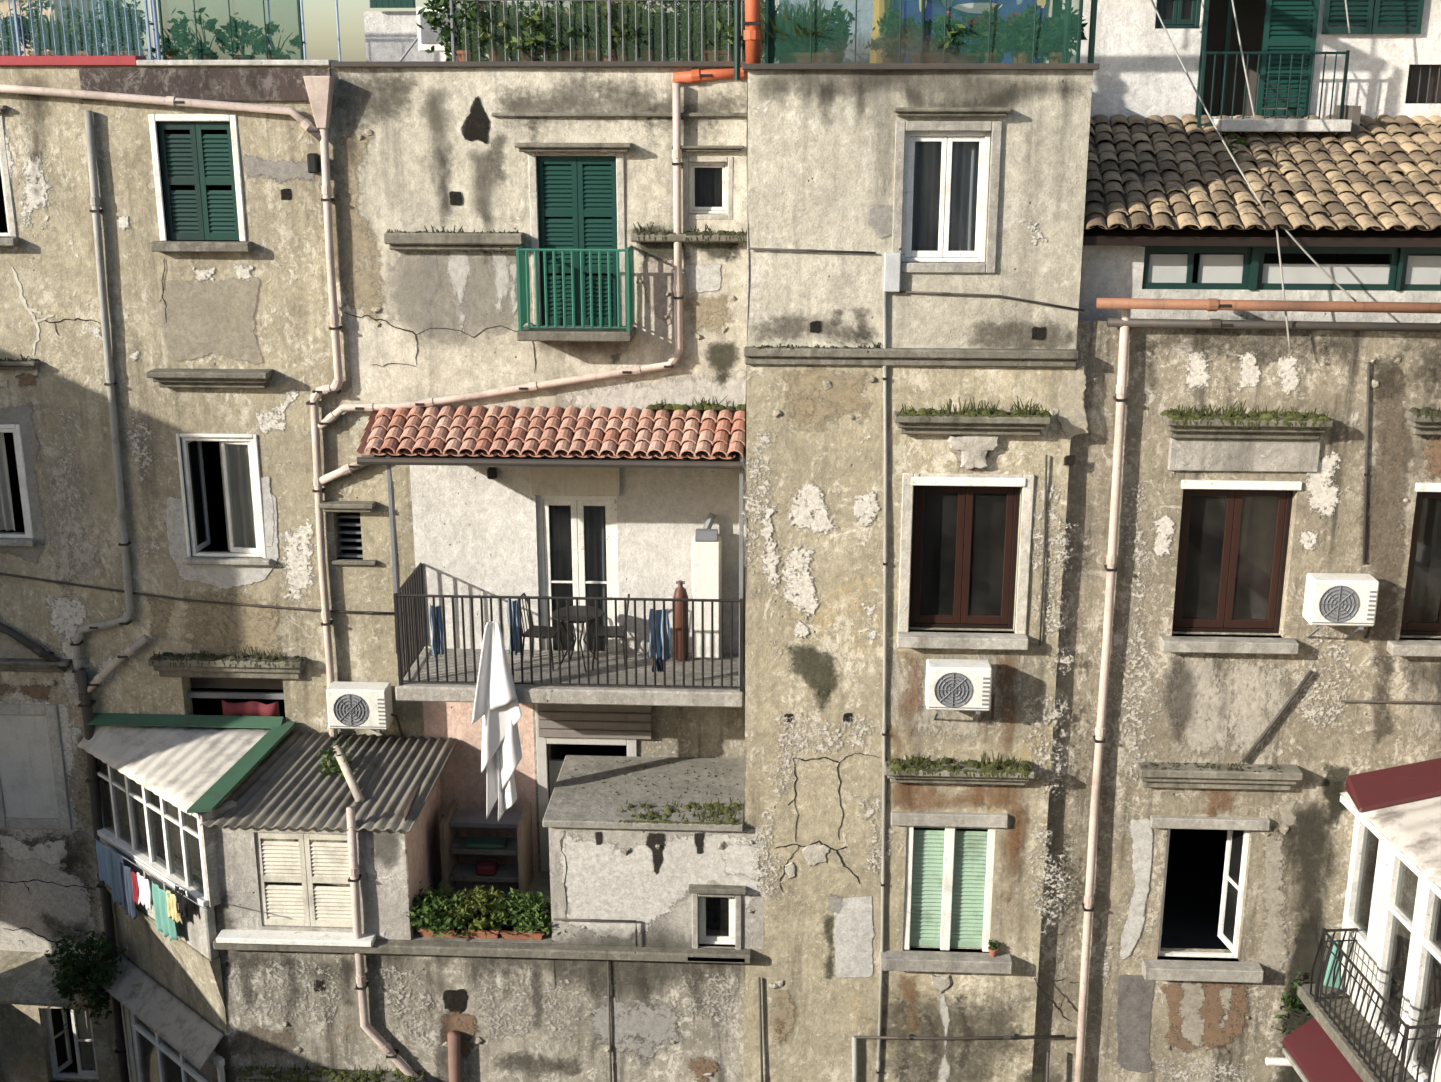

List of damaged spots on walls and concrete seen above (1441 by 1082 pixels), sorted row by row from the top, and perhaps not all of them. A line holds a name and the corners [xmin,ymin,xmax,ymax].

spalling [461,96,489,144]
crack [11,267,99,355]
crack [339,307,536,373]
peeling [1185,349,1213,391]
peeling [1236,351,1301,394]
peeling [740,365,881,642]
flaking render [147,476,318,656]
water stain [789,646,837,708]
flaking render [0,591,114,973]
crack [775,753,879,892]
water stain [1276,765,1348,1082]
spalling [1150,981,1257,1082]